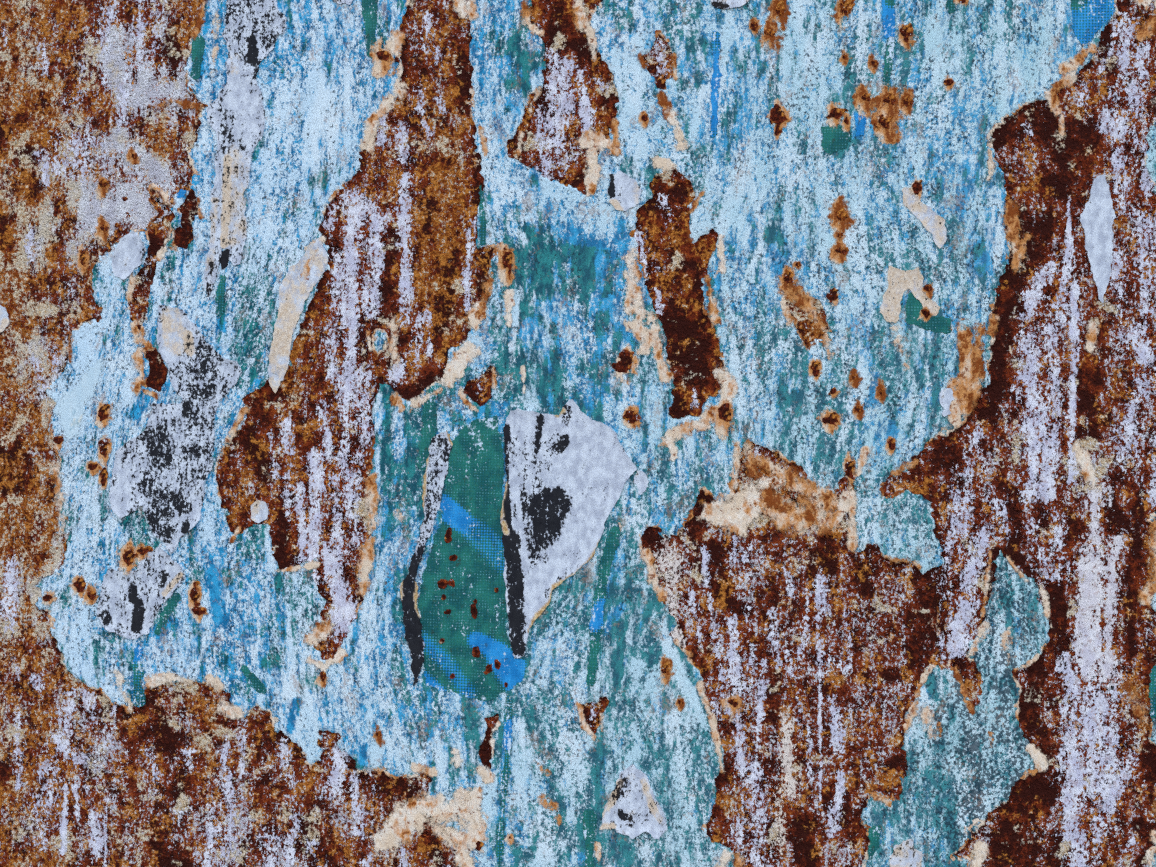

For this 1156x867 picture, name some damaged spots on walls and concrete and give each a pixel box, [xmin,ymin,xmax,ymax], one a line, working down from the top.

peeling [97,304,242,707]
peeling [203,0,288,316]
corrosion [0,0,517,867]
peeling [268,238,328,393]
peeling [400,388,649,867]
corrosion [507,0,621,197]
corrosion [611,0,1156,867]
peeling [1080,174,1116,303]
peeling [582,764,667,867]